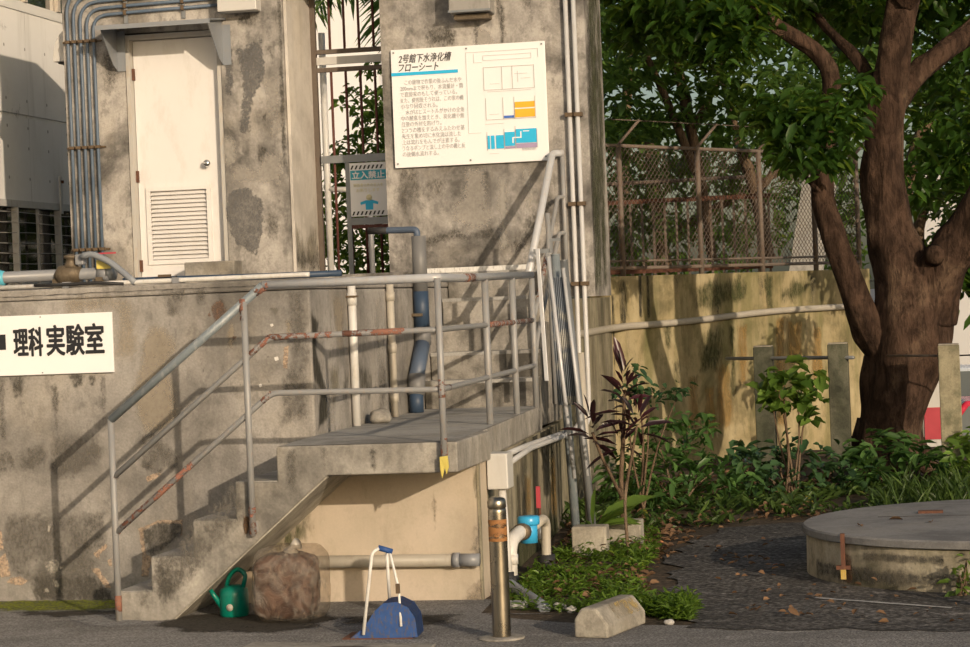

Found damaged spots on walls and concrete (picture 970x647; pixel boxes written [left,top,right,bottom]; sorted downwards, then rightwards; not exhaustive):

damp [225,40,265,133]
damp [226,188,278,255]
damp [697,281,746,307]
damp [762,275,813,307]
rust [249,328,404,355]
damp [702,326,734,393]
rust [119,463,193,534]
damp [6,516,142,627]
damp [156,488,240,596]
damp [271,525,304,552]
damp [158,613,371,632]
damp [422,614,460,625]